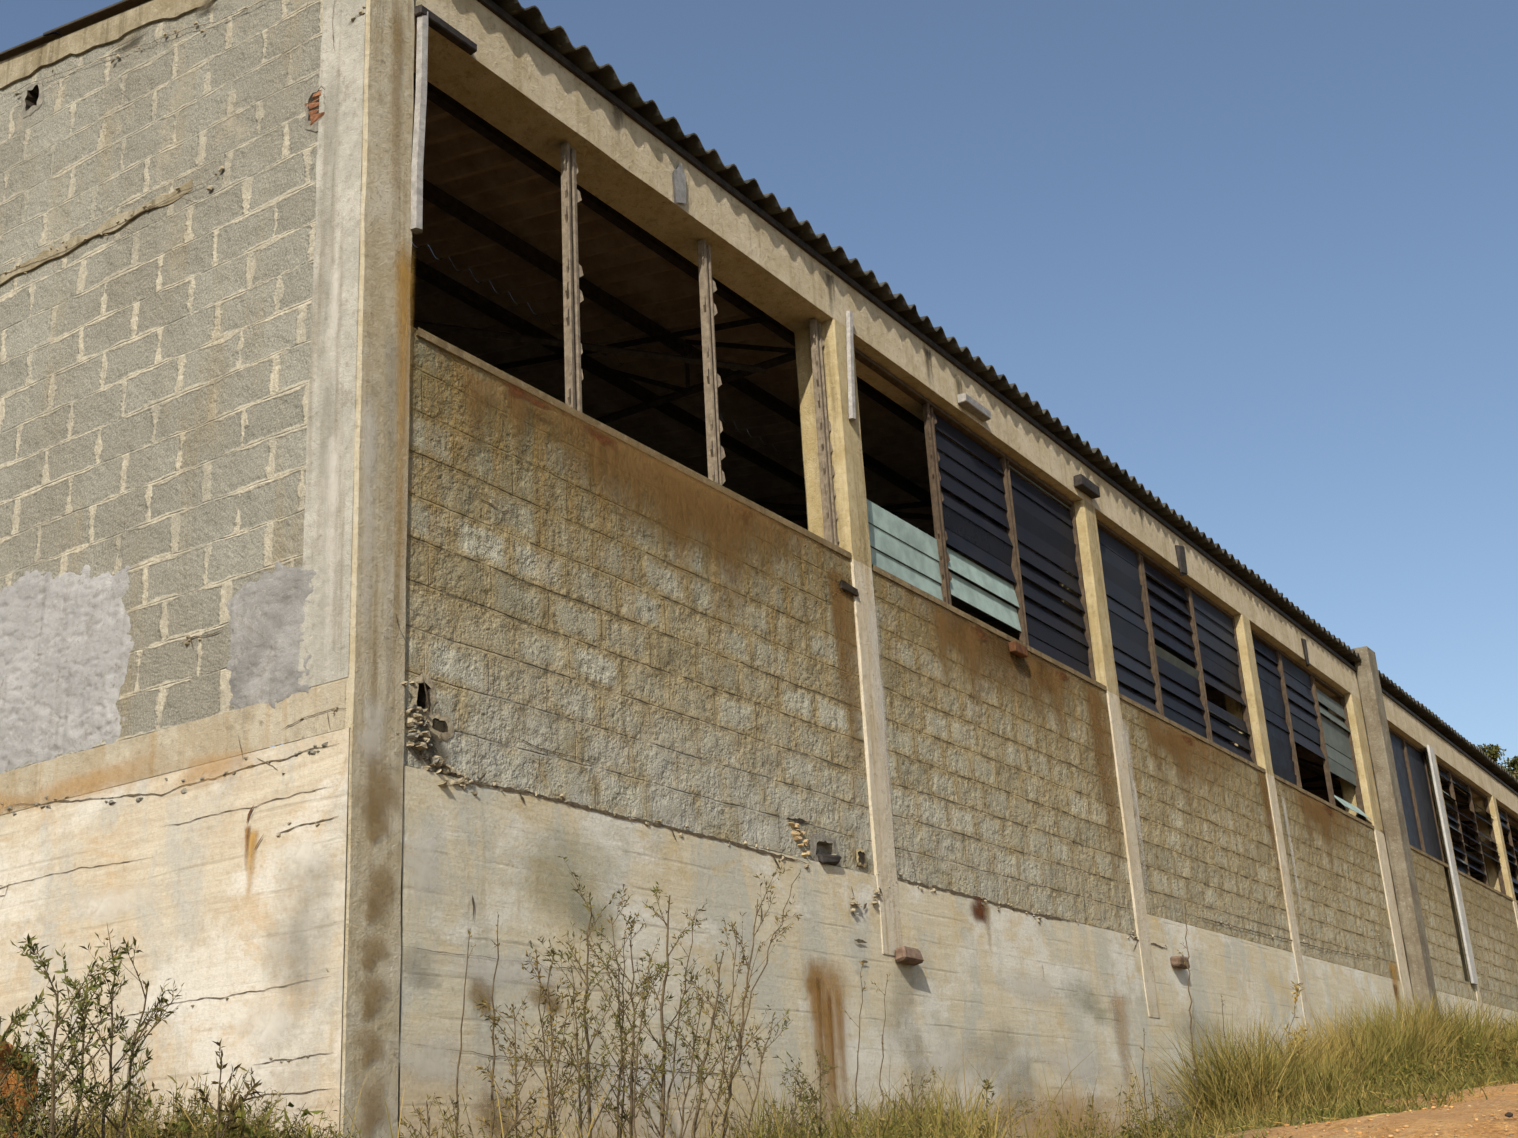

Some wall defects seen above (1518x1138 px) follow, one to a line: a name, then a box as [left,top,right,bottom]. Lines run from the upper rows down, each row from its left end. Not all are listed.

crack [6,0,263,96]
crack [305,0,366,50]
crack [1,166,228,275]
spalling [396,672,454,787]
crack [0,707,347,901]
rust [245,826,256,865]
spalling [787,817,867,867]
spalling [850,887,882,916]
rust [973,898,988,921]
crack [60,968,329,1031]
rust [809,971,842,1065]
crack [252,1052,333,1104]